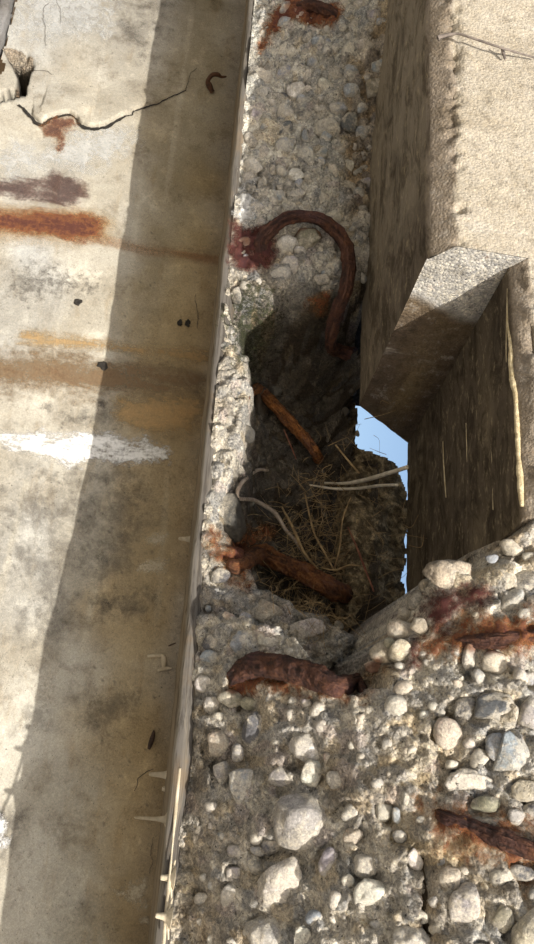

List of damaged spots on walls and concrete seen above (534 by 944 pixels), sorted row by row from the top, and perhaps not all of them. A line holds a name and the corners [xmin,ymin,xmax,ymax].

rust [257,0,345,54]
spalling [2,48,33,98]
crack [17,71,193,131]
rust [43,117,75,151]
rust [0,175,109,244]
rust [171,218,278,273]
spalling [170,0,534,944]
rust [207,523,276,591]
rust [408,583,534,669]
rust [228,677,372,703]
rust [418,800,534,866]